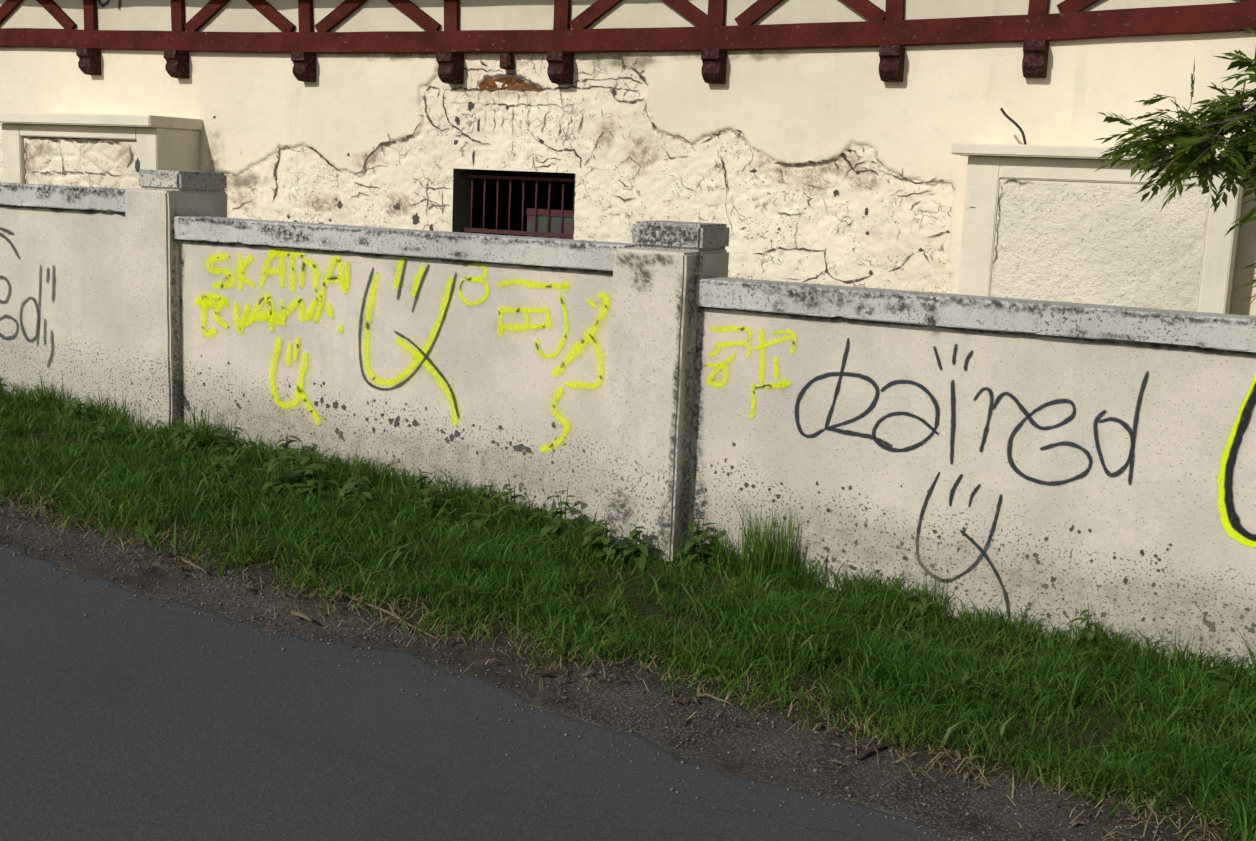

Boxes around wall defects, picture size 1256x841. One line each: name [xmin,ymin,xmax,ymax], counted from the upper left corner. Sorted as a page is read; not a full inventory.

damp [234,175,257,205]
flaking render [223,52,954,294]
crack [233,56,1032,286]
damp [171,214,1256,549]